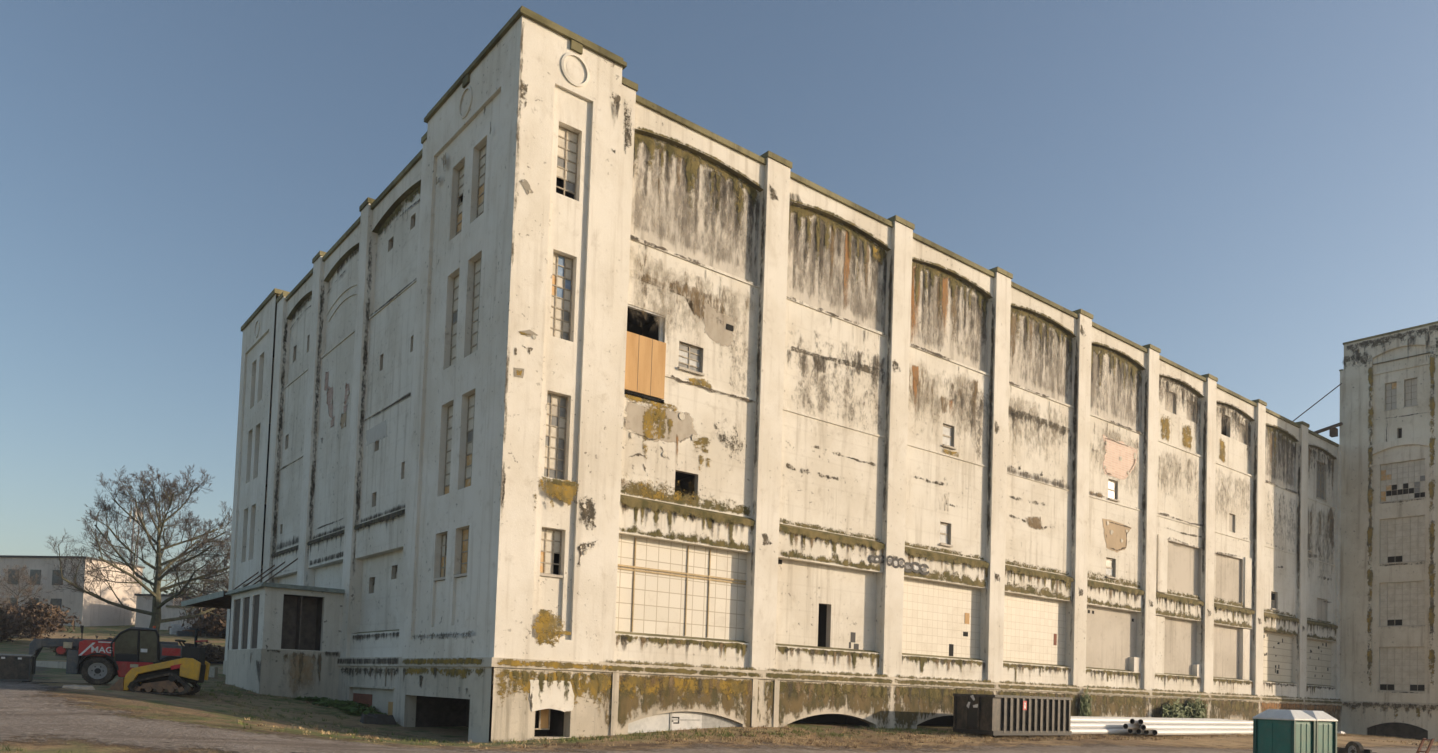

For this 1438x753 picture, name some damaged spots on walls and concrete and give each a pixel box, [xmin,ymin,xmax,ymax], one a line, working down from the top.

leakage [612,94,764,323]
leakage [787,214,892,338]
spalling [321,371,349,443]
flaking render [623,393,710,470]
leakage [788,336,889,427]
spalling [1102,434,1137,479]
leakage [909,267,1335,566]
leakage [1342,325,1438,369]
spalling [1102,519,1131,552]